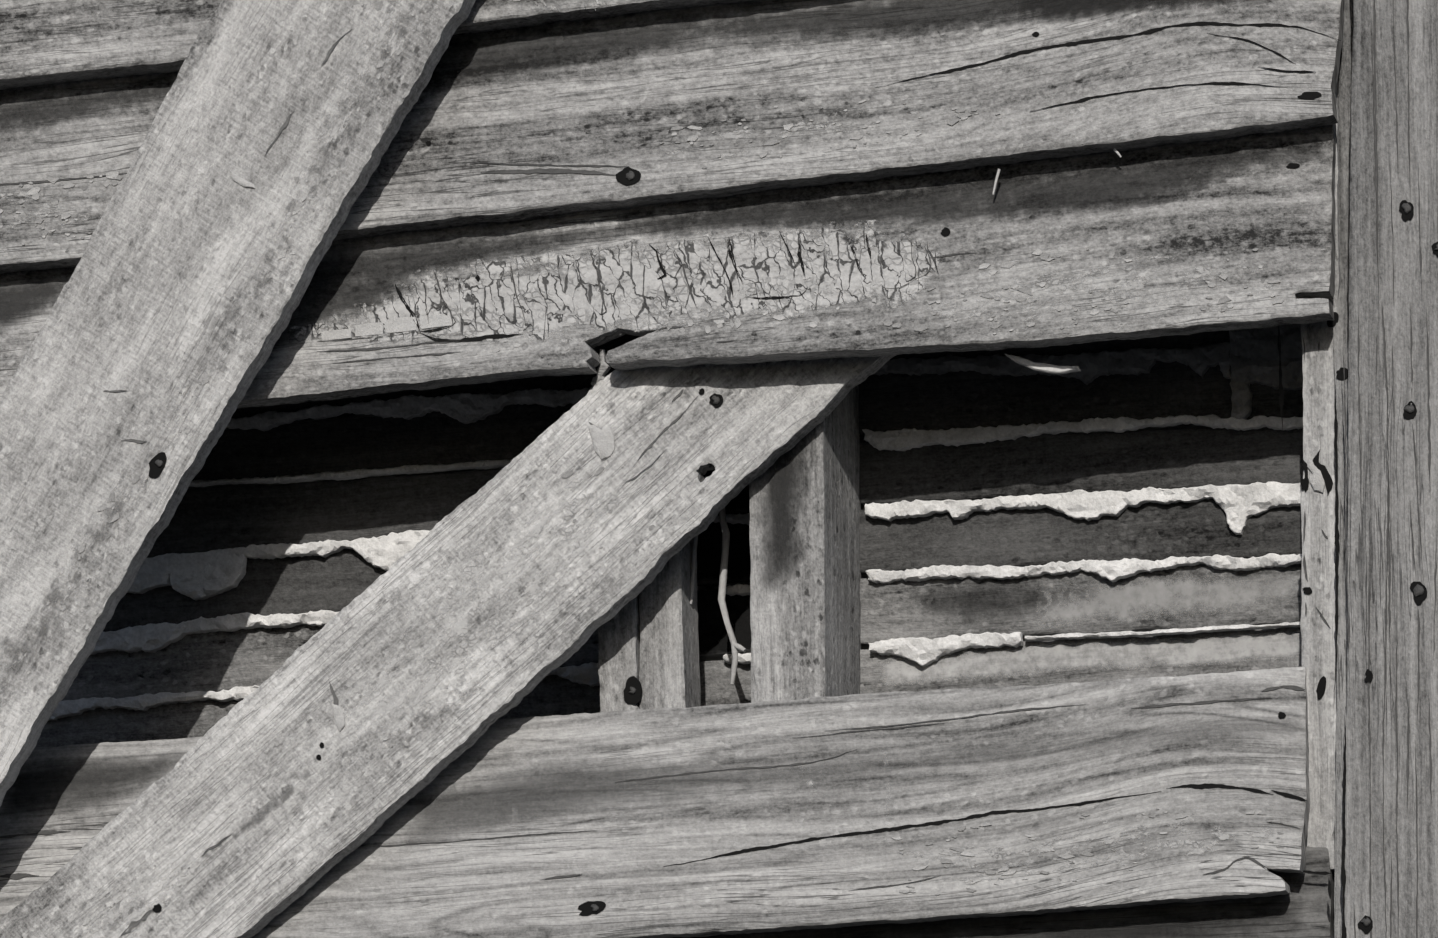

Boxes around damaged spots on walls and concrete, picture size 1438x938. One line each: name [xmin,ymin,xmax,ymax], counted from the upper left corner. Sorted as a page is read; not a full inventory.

crack [728,239,808,300]
crack [849,234,967,289]
peeling [675,289,742,334]
crack [589,390,697,483]
crack [879,0,1437,938]
crack [620,704,1082,782]
crack [372,830,597,847]
crack [663,783,1307,867]
crack [541,873,581,881]
crack [848,876,937,891]